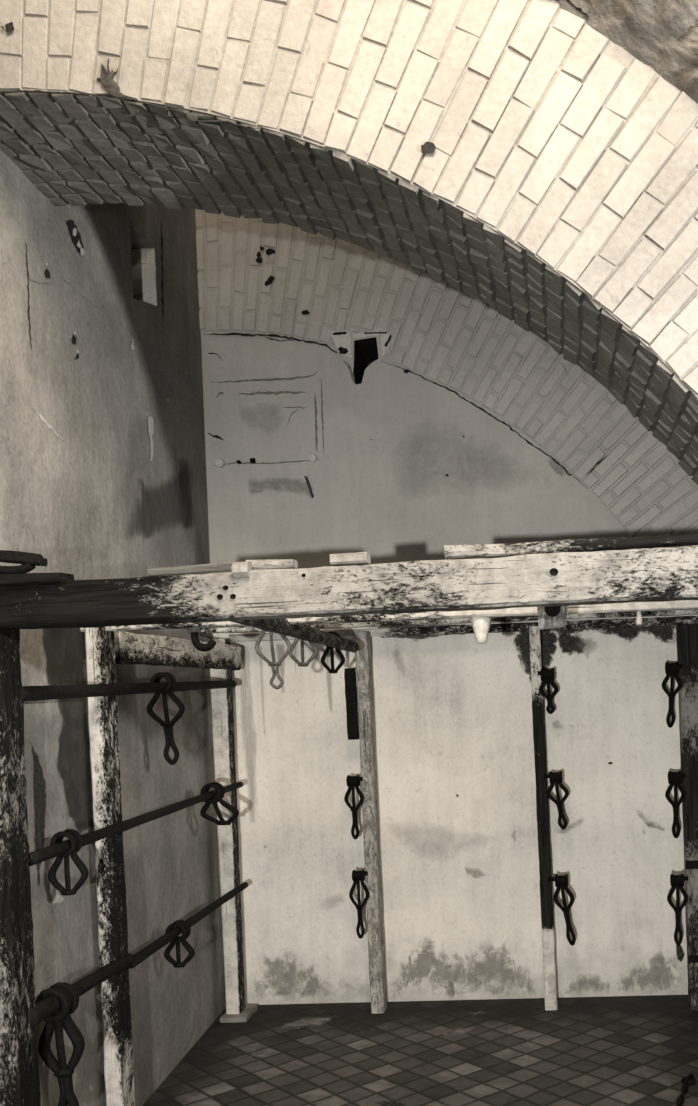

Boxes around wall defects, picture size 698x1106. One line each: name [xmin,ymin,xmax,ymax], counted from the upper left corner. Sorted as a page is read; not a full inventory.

damp [266,960,320,995]
damp [400,942,531,995]
damp [623,945,684,989]